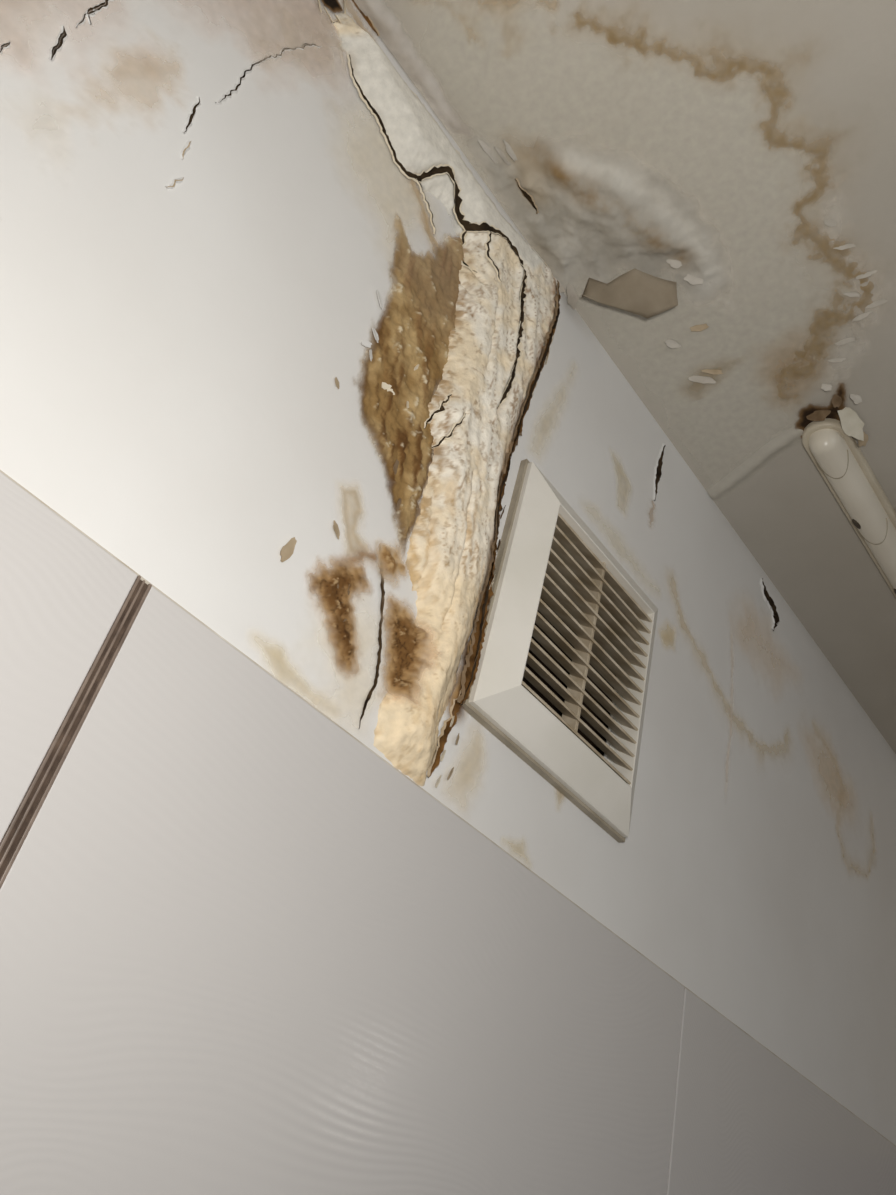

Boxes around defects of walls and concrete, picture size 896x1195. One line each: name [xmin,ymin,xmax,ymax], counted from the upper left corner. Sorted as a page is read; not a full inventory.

crack [0,41,11,55]
crack [48,0,114,61]
crack [165,0,561,788]
flaking render [359,181,464,553]
water stain [575,12,874,399]
crack [760,578,780,631]